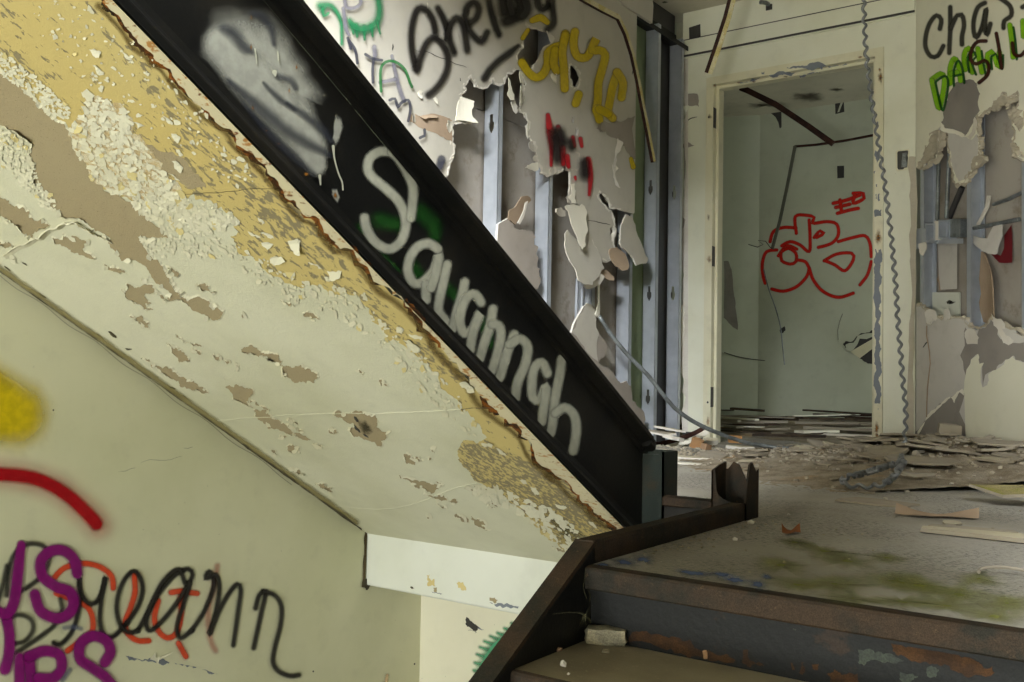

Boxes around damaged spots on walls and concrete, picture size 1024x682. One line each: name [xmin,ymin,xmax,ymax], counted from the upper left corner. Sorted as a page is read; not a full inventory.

peeling [0,0,612,553]
spalling [586,190,621,261]
peeling [596,116,636,188]
peeling [906,79,1024,437]